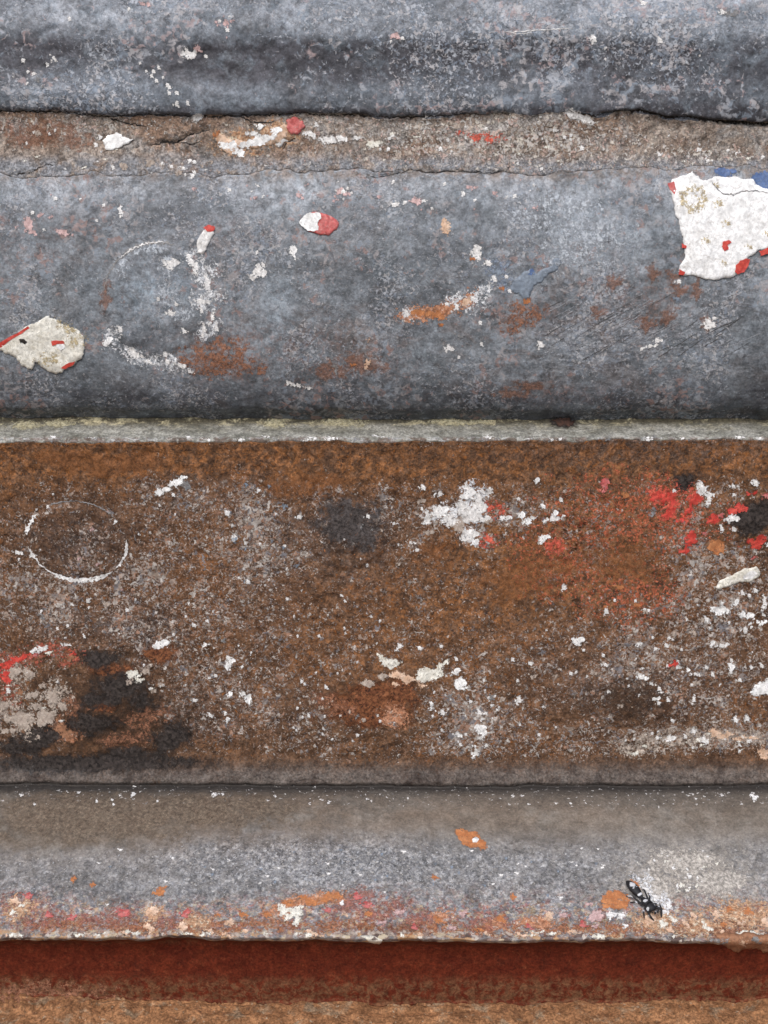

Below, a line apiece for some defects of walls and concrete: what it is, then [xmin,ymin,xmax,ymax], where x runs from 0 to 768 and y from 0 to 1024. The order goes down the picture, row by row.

crack [0,110,513,149]
peeling [668,141,768,284]
peeling [0,315,195,374]
rust [177,334,268,381]
rust [140,645,179,665]
rust [48,719,153,749]
leakage [0,647,219,782]
rust [309,676,422,730]
rust [0,914,754,939]
rust [0,978,124,1008]